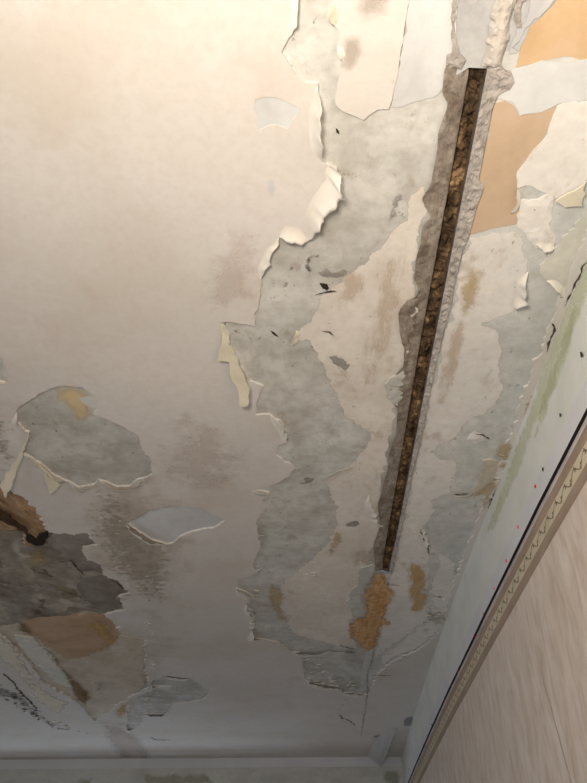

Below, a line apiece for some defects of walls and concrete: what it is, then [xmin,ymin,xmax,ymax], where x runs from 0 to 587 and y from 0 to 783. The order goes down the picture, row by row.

crack [566,262,587,303]
peeling [218,0,587,723]
spalling [0,386,224,734]
corrosion [349,573,394,651]
corrosion [410,564,426,611]